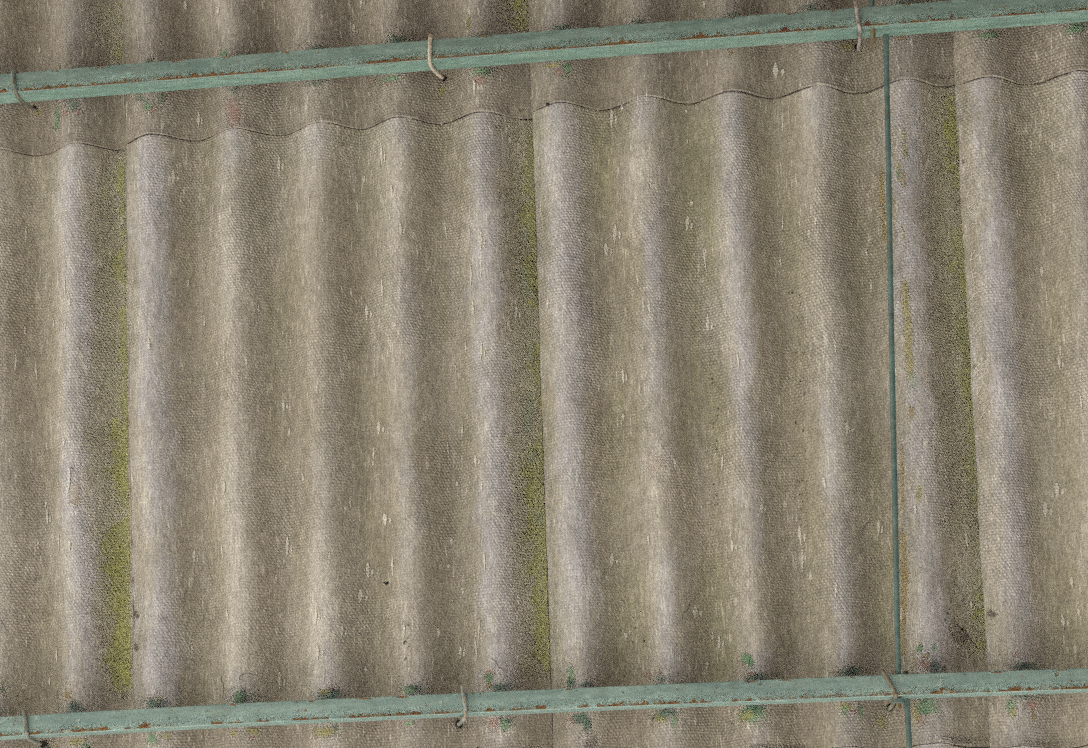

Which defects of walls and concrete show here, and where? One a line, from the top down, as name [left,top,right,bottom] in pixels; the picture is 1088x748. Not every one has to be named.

corrosion [0,5,1088,93]
corrosion [0,718,110,736]
corrosion [125,669,1088,729]